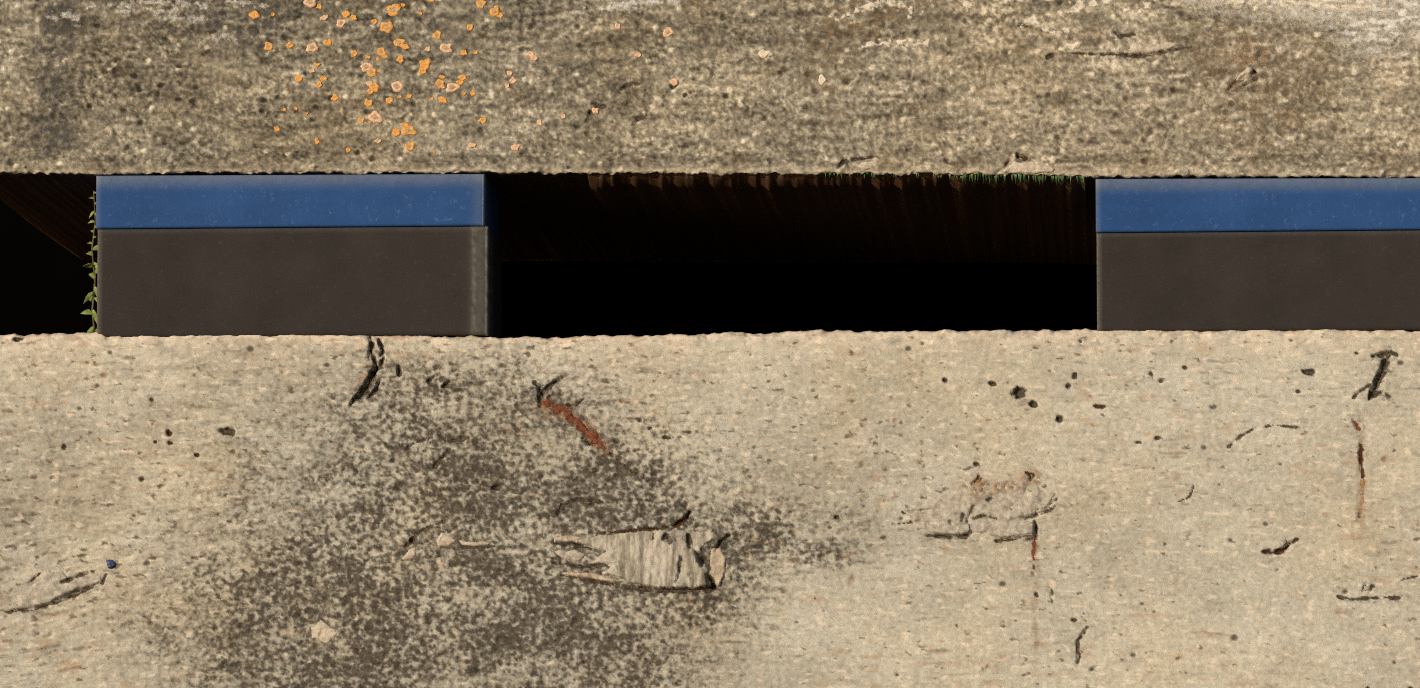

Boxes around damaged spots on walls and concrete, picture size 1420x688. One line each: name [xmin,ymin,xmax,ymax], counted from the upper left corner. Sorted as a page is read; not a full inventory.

crack [1021,23,1192,60]
crack [349,337,450,407]
crack [1352,351,1398,401]
water stain [132,361,851,688]
spalling [555,497,603,515]
corrosion [532,377,649,482]
spalling [551,510,731,594]
spalling [898,472,1058,569]
corrosion [1352,421,1365,518]